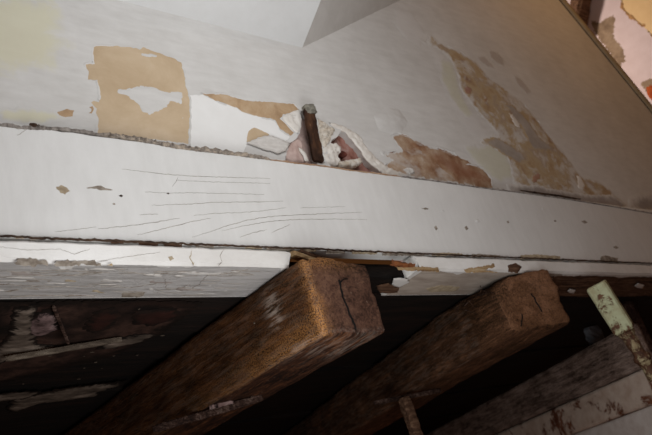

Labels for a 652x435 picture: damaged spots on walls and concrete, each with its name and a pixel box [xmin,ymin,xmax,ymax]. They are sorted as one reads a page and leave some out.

flaking render [591,15,626,66]
peeling [620,0,652,37]
peeling [83,44,312,164]
peeling [421,34,613,196]
leakage [426,41,652,210]
flaking render [641,79,652,100]
peeling [318,119,493,188]
peeling [14,257,115,271]
peeling [464,254,500,273]
spalling [508,254,560,273]